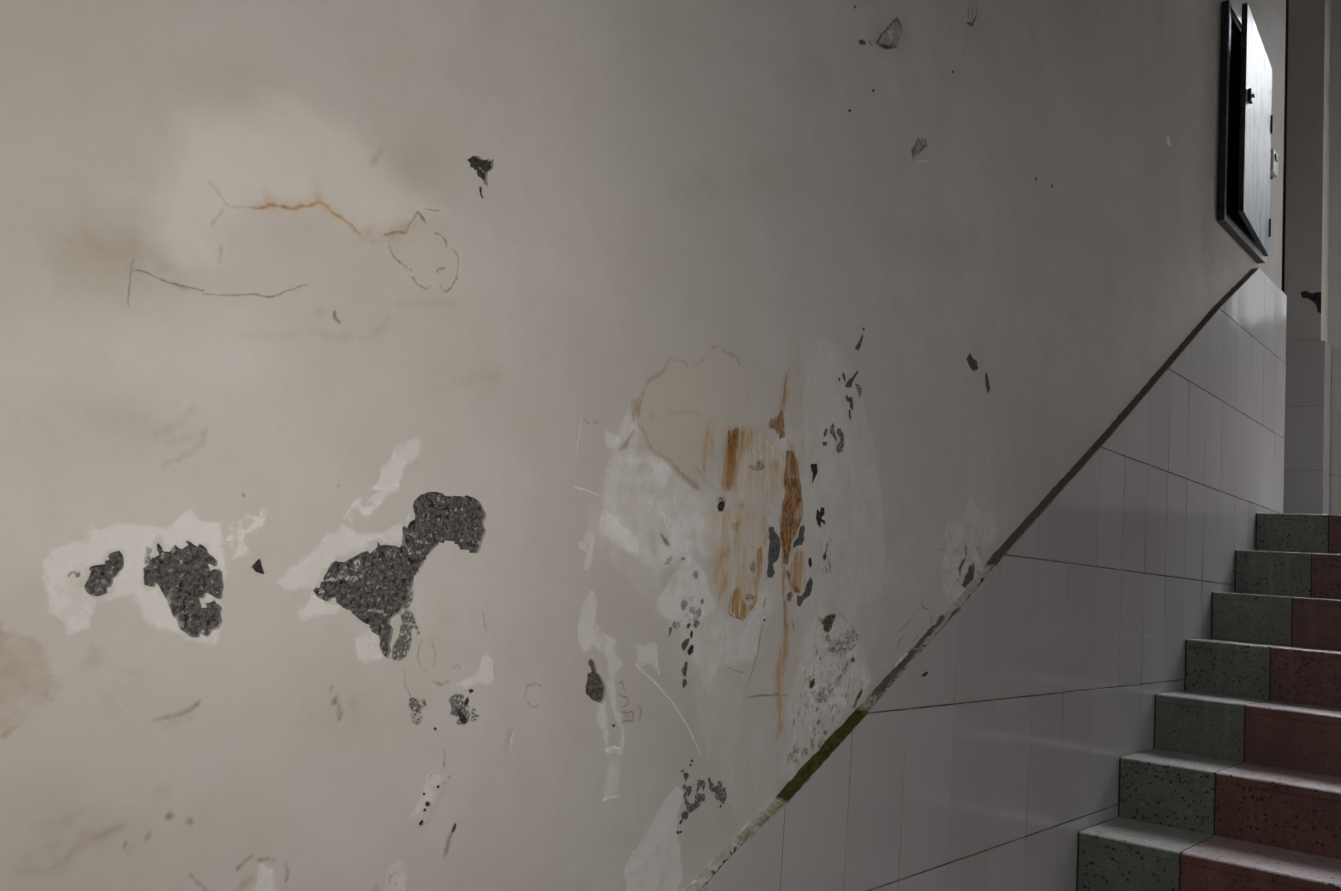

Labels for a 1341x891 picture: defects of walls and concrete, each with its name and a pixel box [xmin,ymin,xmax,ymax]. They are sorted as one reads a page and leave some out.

spalling [467,156,492,198]
crack [261,204,356,230]
peeling [823,370,862,453]
spalling [68,551,122,596]
spalling [143,541,222,637]
spalling [252,559,264,574]
spalling [313,492,484,660]
rust [714,383,803,727]
spalling [750,507,825,578]
peeling [669,597,704,688]
spalling [586,660,604,703]
peeling [676,760,727,834]